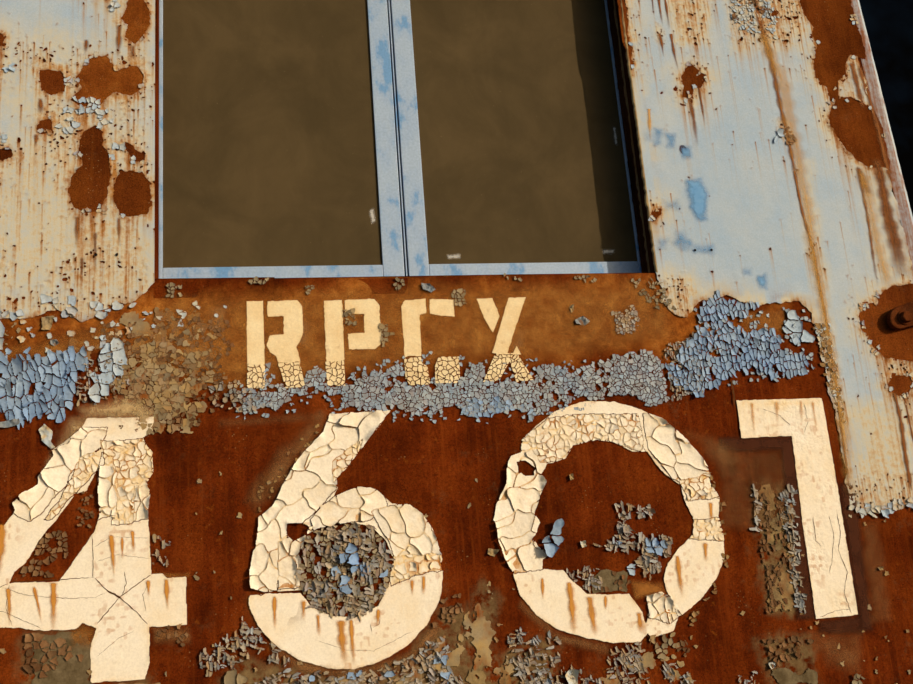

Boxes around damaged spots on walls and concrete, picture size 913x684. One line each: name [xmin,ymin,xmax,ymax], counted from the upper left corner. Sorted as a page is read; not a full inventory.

peeling [55,96,114,134]
corrosion [35,0,150,143]
corrosion [68,126,153,236]
corrosion [799,0,903,276]
corrosion [137,296,413,373]
corrosion [858,284,913,486]
peeling [0,282,847,621]
corrosion [720,437,871,633]
peeling [23,631,92,684]
crack [0,537,150,655]
peeling [199,593,699,684]
peeling [762,621,825,684]